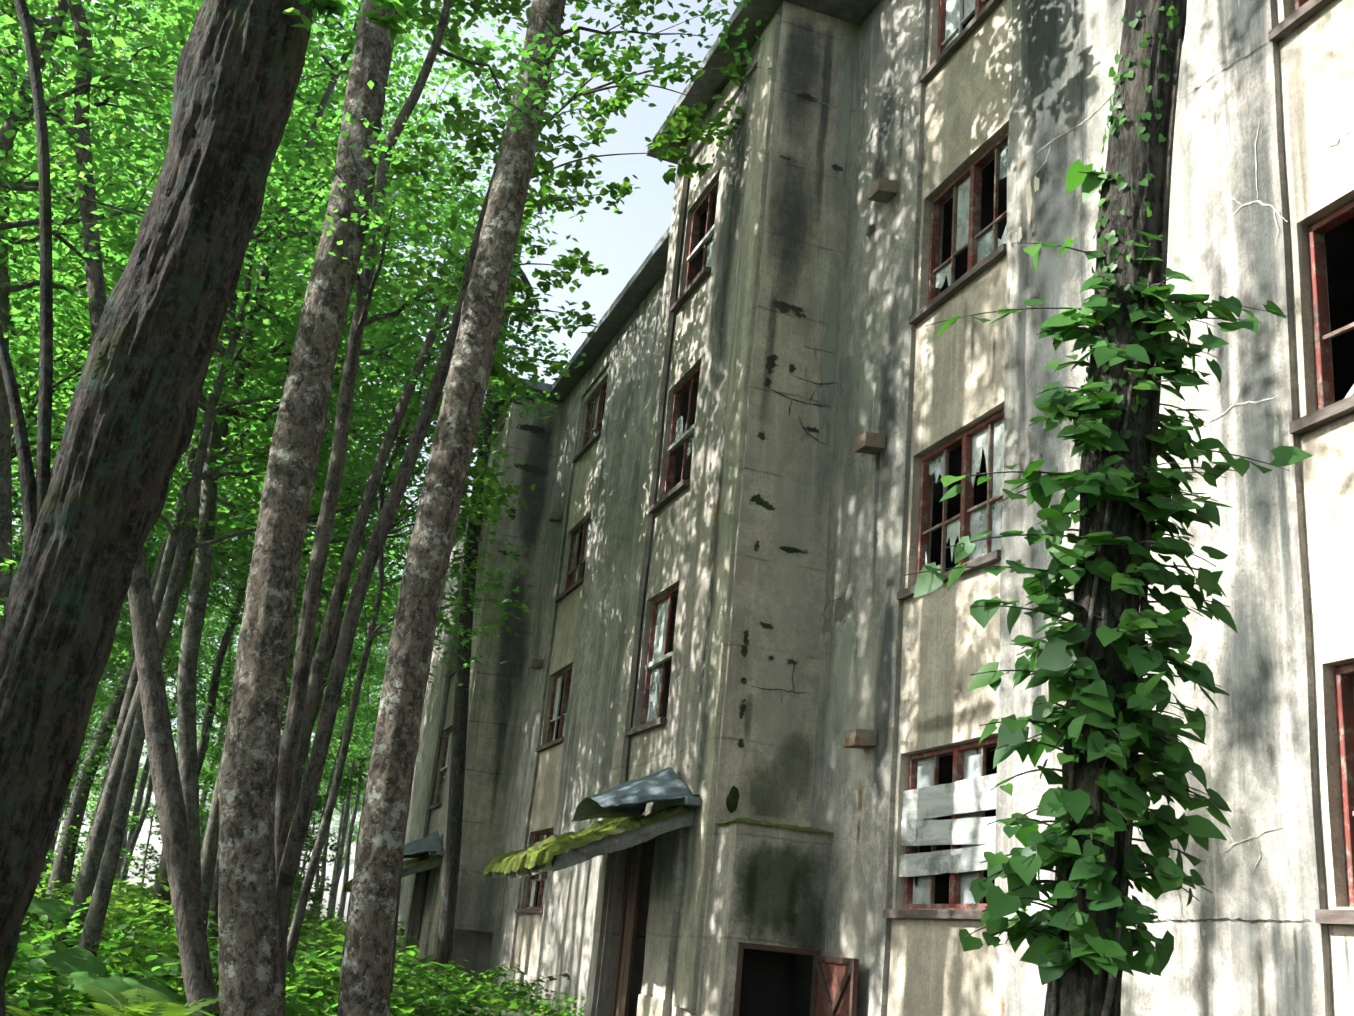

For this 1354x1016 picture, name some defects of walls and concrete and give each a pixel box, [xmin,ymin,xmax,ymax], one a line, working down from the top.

water stain [787,23,852,185]
water stain [1229,0,1264,77]
water stain [773,167,807,279]
water stain [1214,109,1289,613]
water stain [1227,597,1269,754]
water stain [1284,931,1310,1016]